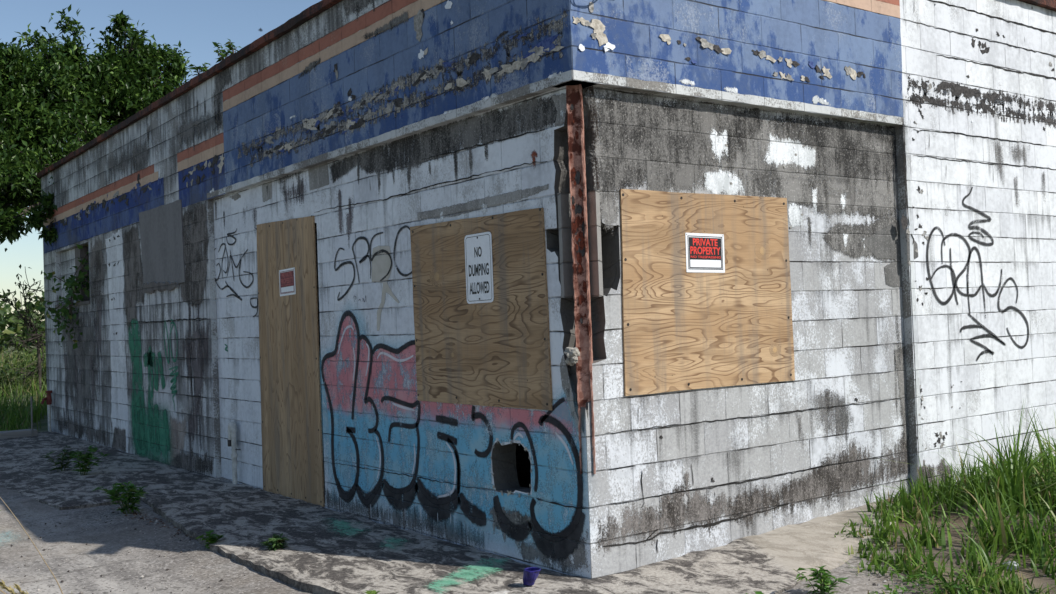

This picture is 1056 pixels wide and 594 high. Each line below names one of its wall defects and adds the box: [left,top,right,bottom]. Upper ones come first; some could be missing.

peeling [181,188,225,345]
peeling [238,2,615,167]
peeling [417,184,549,223]
rust [570,153,587,324]
peeling [659,34,731,64]
damp [597,91,897,222]
peeling [637,93,929,287]
peeling [752,50,832,82]
peeling [906,74,1056,140]
damp [993,140,1027,204]
damp [57,236,213,476]
damp [593,316,953,555]